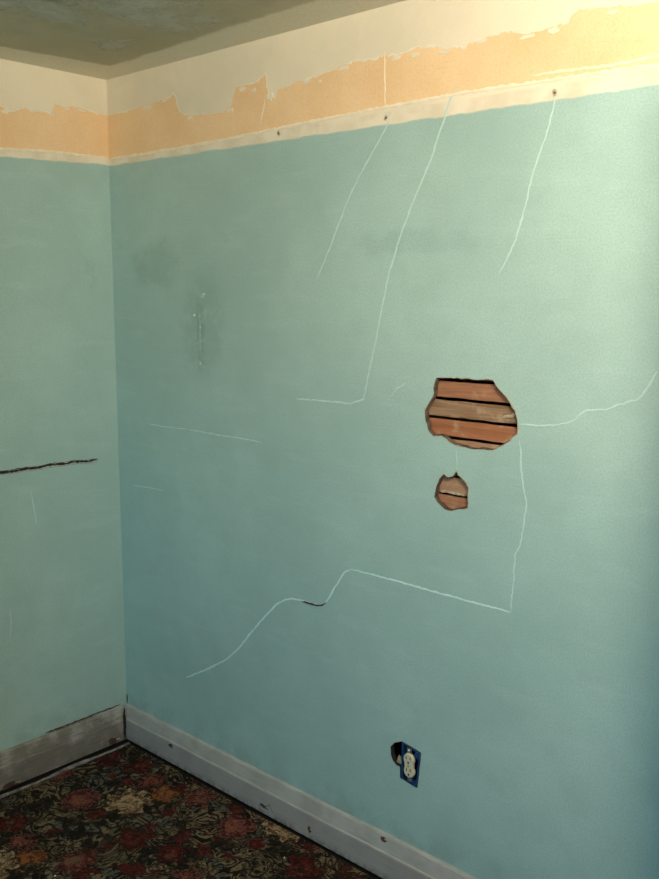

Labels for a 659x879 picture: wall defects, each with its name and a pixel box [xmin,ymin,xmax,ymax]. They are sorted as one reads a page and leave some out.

peeling [0,1,659,159]
crack [297,51,458,405]
crack [498,54,659,275]
crack [0,458,98,475]
crack [186,371,658,678]
spalling [434,471,469,511]
spalling [424,377,519,451]